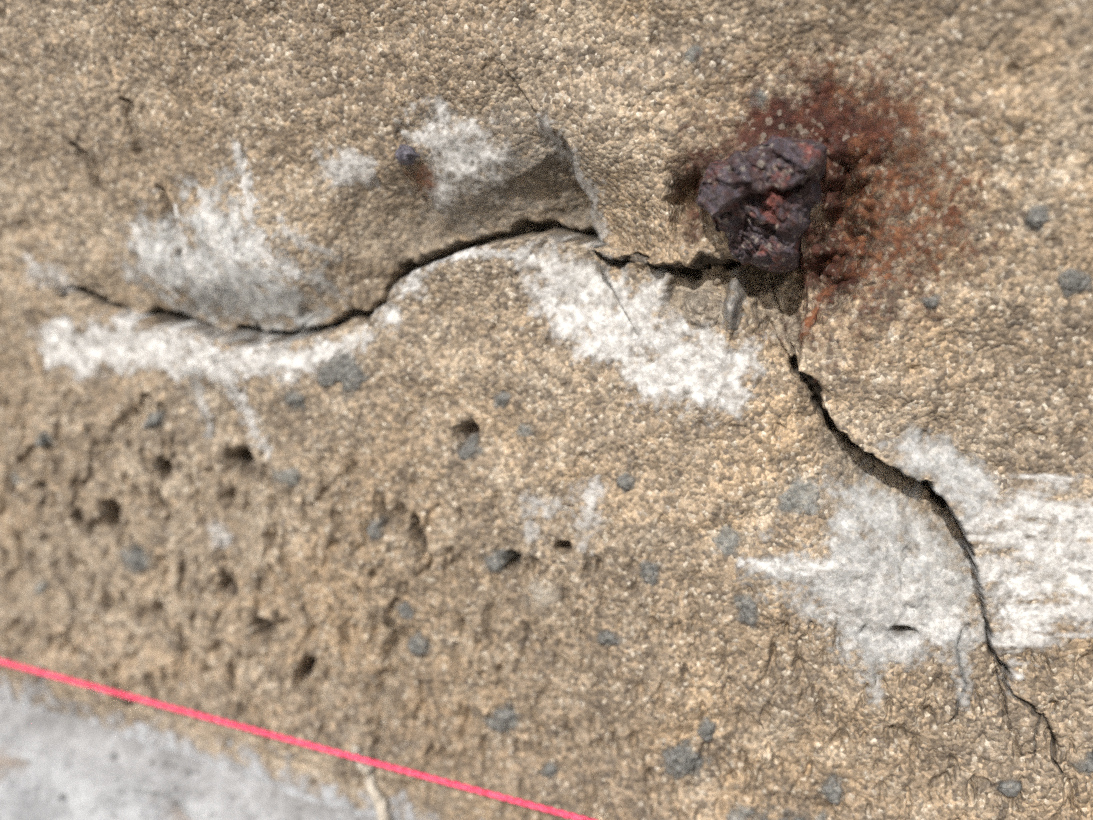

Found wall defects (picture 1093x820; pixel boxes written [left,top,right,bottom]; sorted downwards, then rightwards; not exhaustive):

damp [23,142,377,460]
crack [56,221,740,345]
efflorescence [401,97,514,209]
damp [375,236,766,417]
crack [789,341,847,435]
corrosion [685,81,985,339]
efflorescence [737,428,1093,703]
crack [926,480,1063,773]